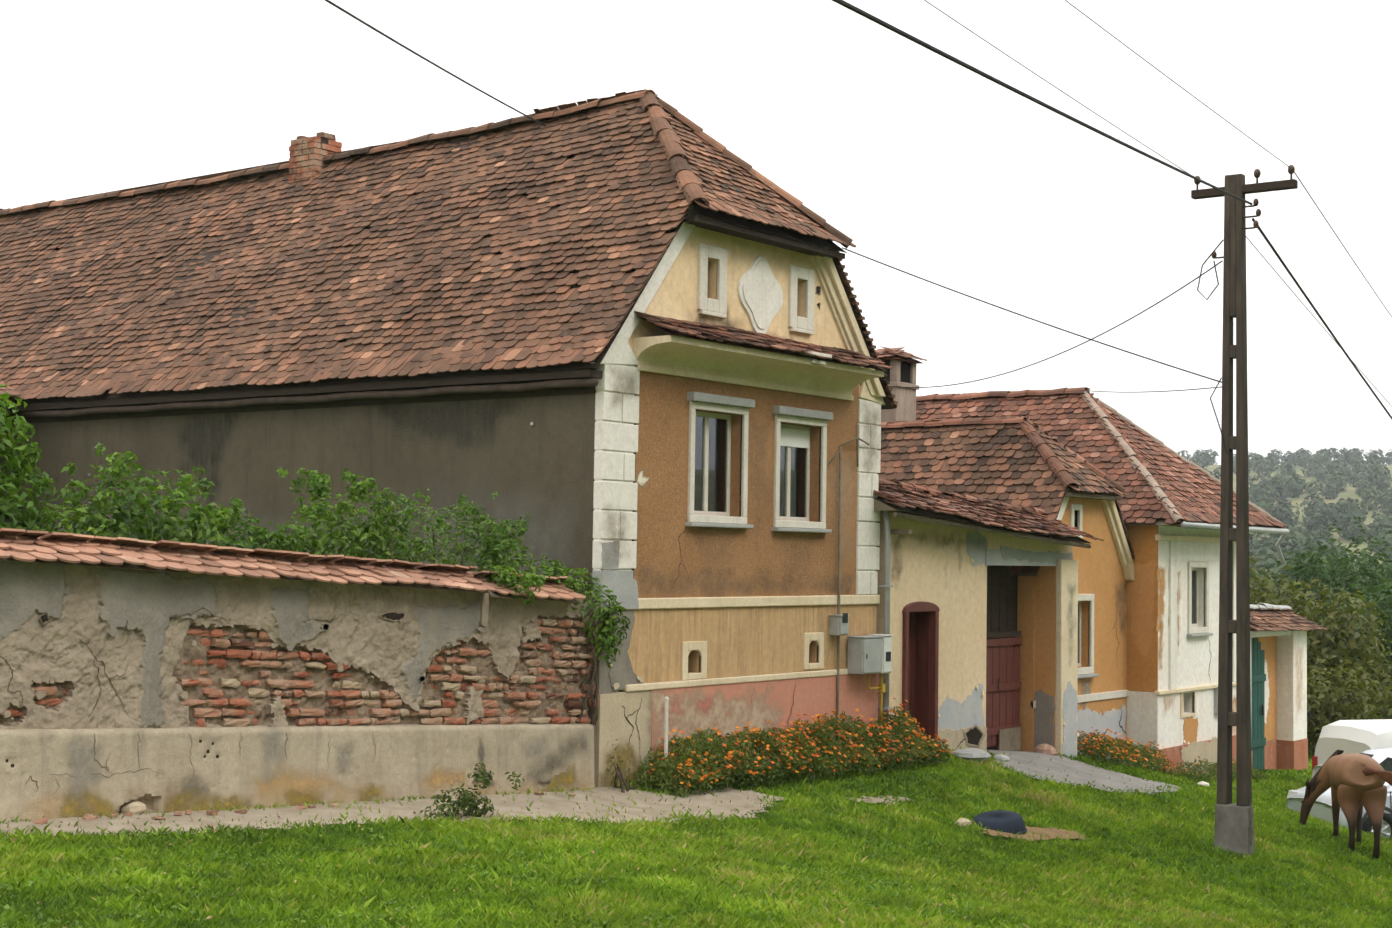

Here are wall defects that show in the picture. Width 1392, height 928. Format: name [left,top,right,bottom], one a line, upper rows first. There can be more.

flaking render [0,561,71,640]
flaking render [0,677,74,726]
crack [26,640,157,794]
flaking render [97,567,645,758]
crack [621,697,642,761]
peeling [938,684,985,749]